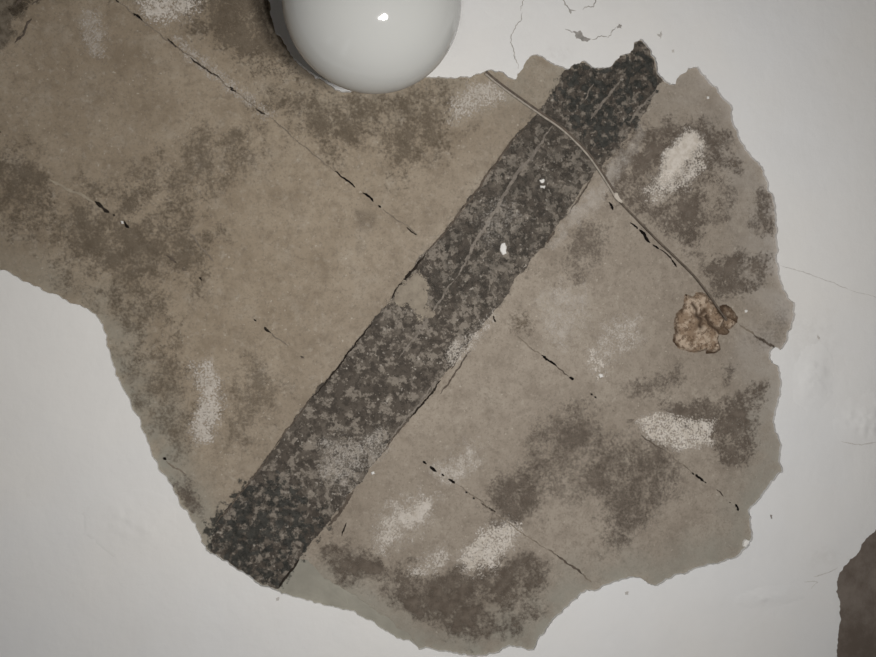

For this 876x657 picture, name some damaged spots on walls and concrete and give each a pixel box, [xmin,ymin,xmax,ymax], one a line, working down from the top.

damp [0,159,210,346]
damp [148,355,225,444]
damp [136,0,292,81]
crack [116,0,417,235]
flaking render [0,0,537,561]
damp [203,449,548,639]
crack [423,461,591,582]
flaking render [229,40,794,655]
crack [510,0,524,67]
damp [550,42,774,298]
damp [591,383,768,542]
flaking render [836,530,876,657]